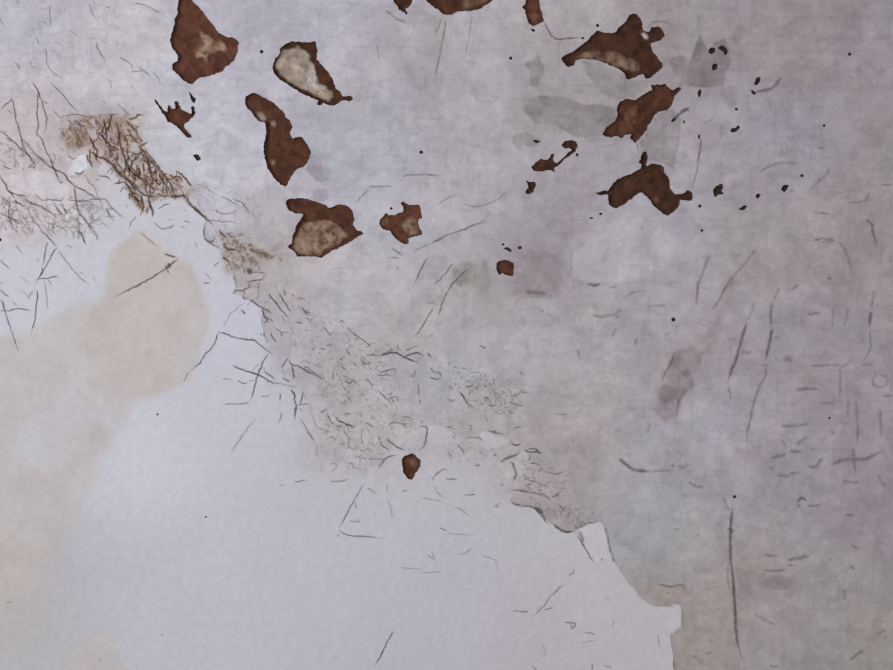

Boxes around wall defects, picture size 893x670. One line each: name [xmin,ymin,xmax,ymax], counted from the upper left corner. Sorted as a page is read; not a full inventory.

crack [1,85,135,347]
rust [57,109,205,218]
crack [126,254,176,291]
leakage [0,226,214,670]
crack [198,279,441,467]
peeling [0,155,682,670]
crack [477,444,592,559]